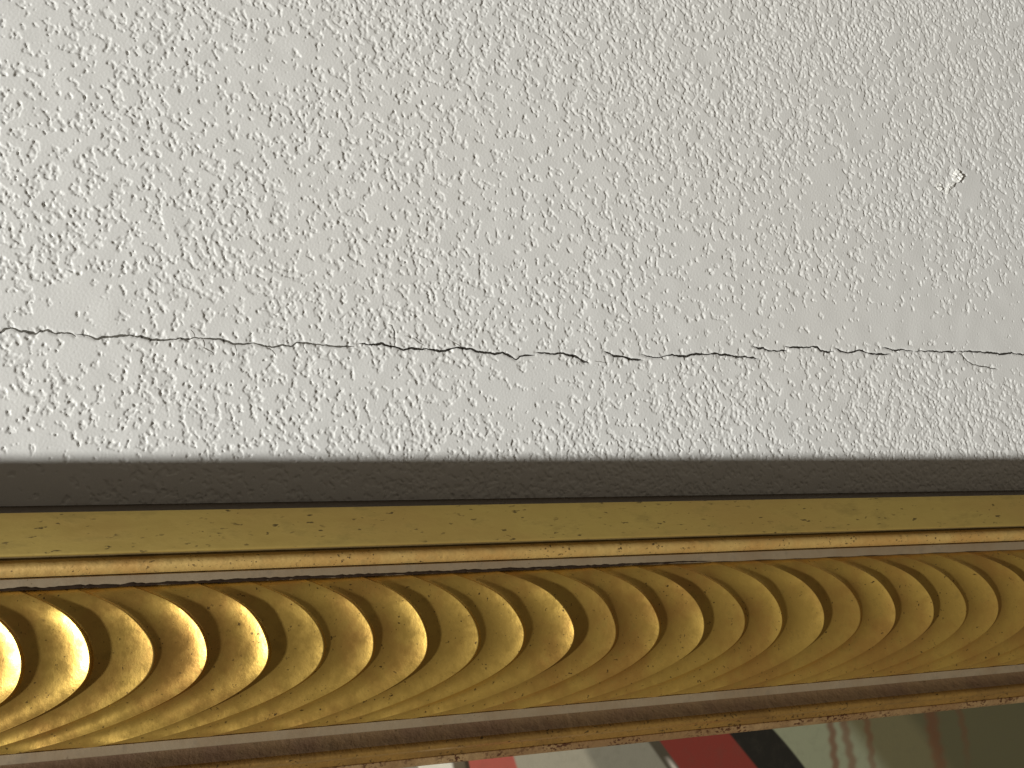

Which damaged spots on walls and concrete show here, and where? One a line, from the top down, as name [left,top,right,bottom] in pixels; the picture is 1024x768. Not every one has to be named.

peeling [933,162,963,194]
crack [0,324,1024,369]